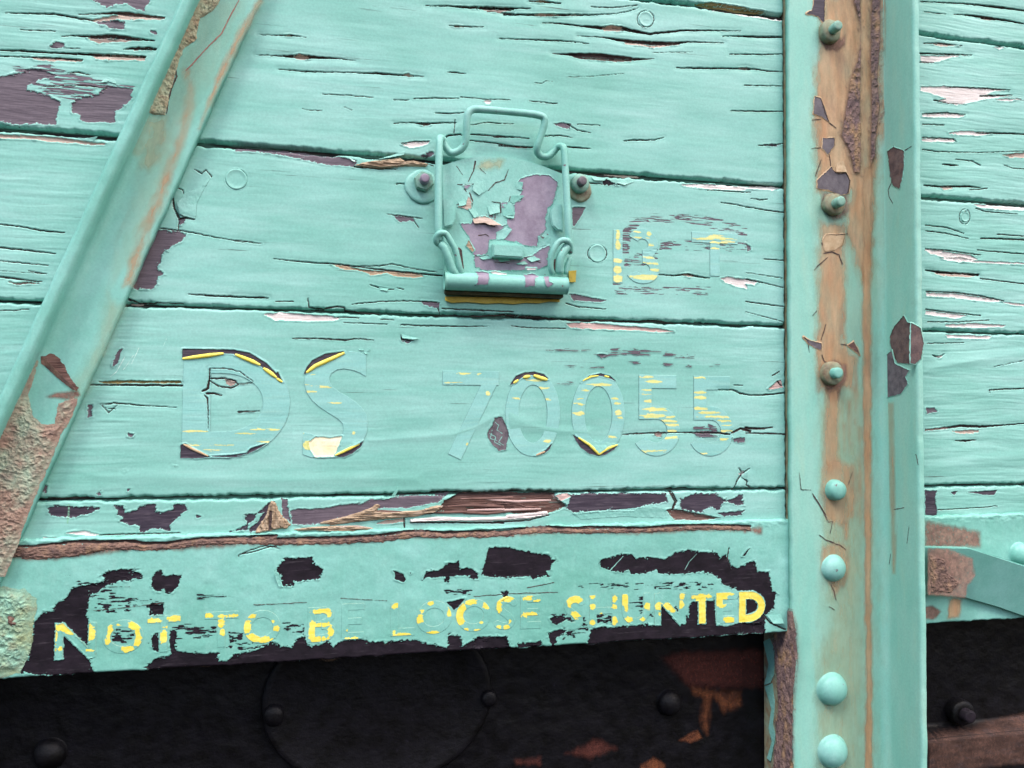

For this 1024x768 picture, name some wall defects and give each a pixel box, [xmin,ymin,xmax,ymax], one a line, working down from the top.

peeling [0,64,135,145]
rust [149,0,220,115]
crack [260,35,590,216]
crack [426,0,783,112]
crack [920,1,1024,24]
crack [128,228,673,341]
rust [815,0,885,768]
peeling [21,568,182,676]
peeling [68,504,202,536]
peeling [144,546,786,761]
rust [666,610,798,768]
rust [925,522,980,619]